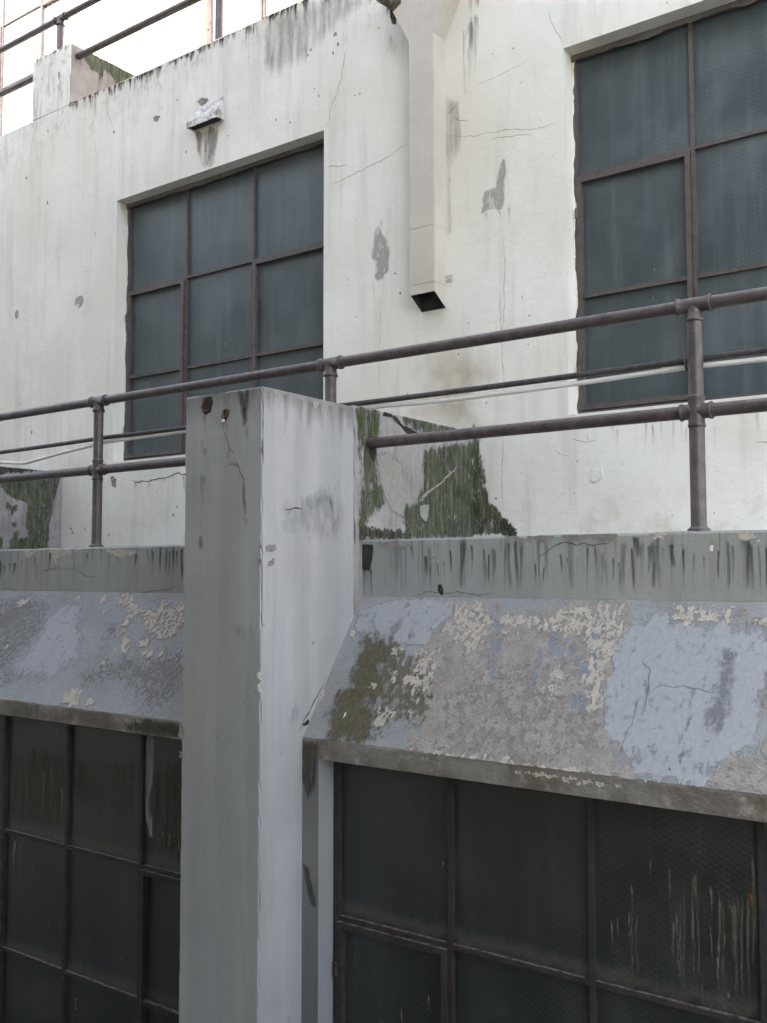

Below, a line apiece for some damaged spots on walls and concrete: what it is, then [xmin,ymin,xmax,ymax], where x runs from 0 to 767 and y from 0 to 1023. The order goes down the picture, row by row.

water stain [69,0,309,107]
crack [447,103,549,139]
crack [328,144,410,184]
spalling [482,159,505,212]
water stain [0,466,43,475]
crack [138,425,246,511]
water stain [359,525,411,578]
water stain [499,518,518,576]
peeling [670,603,767,639]
peeling [374,599,638,788]
crack [618,657,717,745]
peeling [707,740,767,795]